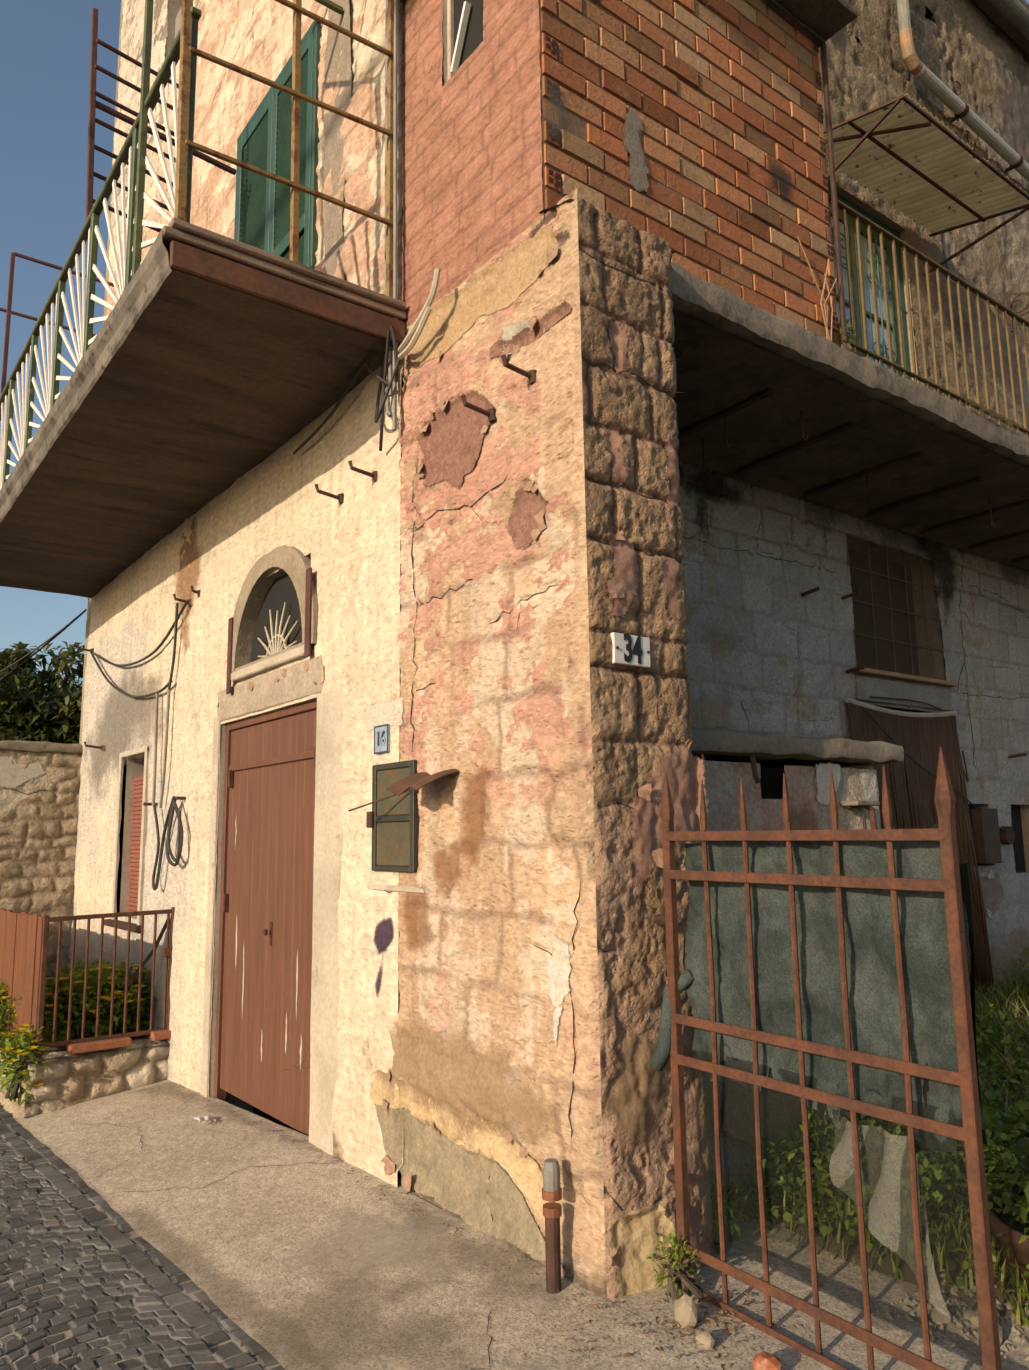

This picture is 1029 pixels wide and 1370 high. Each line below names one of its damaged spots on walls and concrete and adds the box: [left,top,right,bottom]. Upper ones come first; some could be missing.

spalling [416,390,493,489]
spalling [506,481,548,550]
leakage [678,466,739,528]